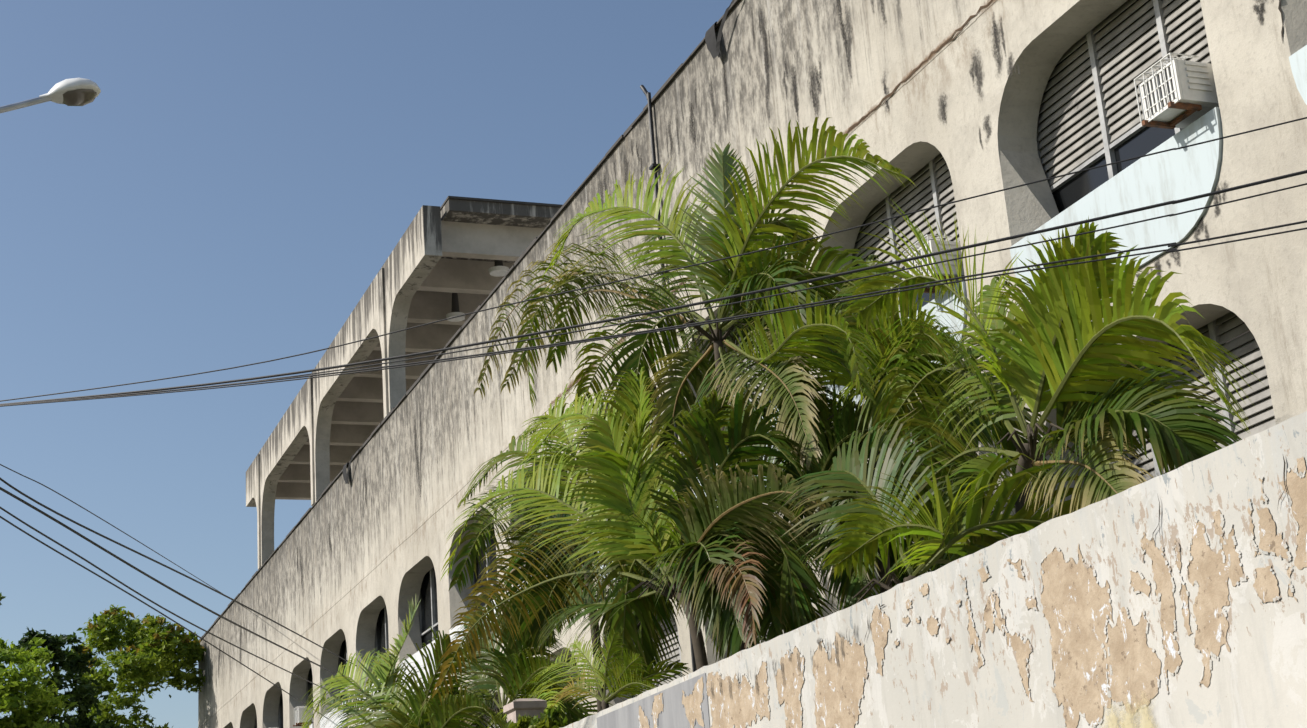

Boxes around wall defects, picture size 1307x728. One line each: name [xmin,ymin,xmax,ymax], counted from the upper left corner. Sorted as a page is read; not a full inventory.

damp [666,59,729,157]
damp [752,11,821,118]
damp [836,0,852,78]
damp [970,18,1020,94]
damp [589,140,642,218]
peeling [681,583,950,728]
peeling [956,565,1033,702]
peeling [1006,457,1307,728]
peeling [637,692,663,728]